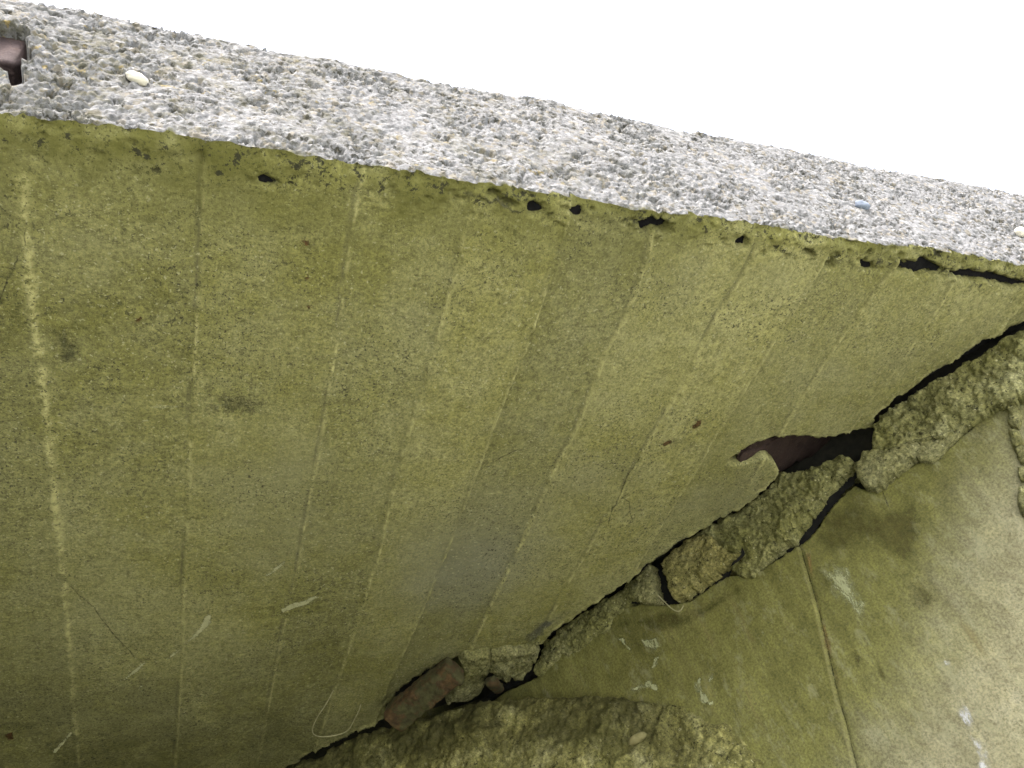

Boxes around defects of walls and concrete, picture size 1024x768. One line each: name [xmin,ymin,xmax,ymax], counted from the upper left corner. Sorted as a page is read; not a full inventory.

crack [927,322,1024,377]
spalling [1007,405,1024,517]
crack [617,539,745,605]
crack [772,472,857,758]
damp [825,567,864,614]
crack [487,667,534,698]
spalling [286,695,764,768]